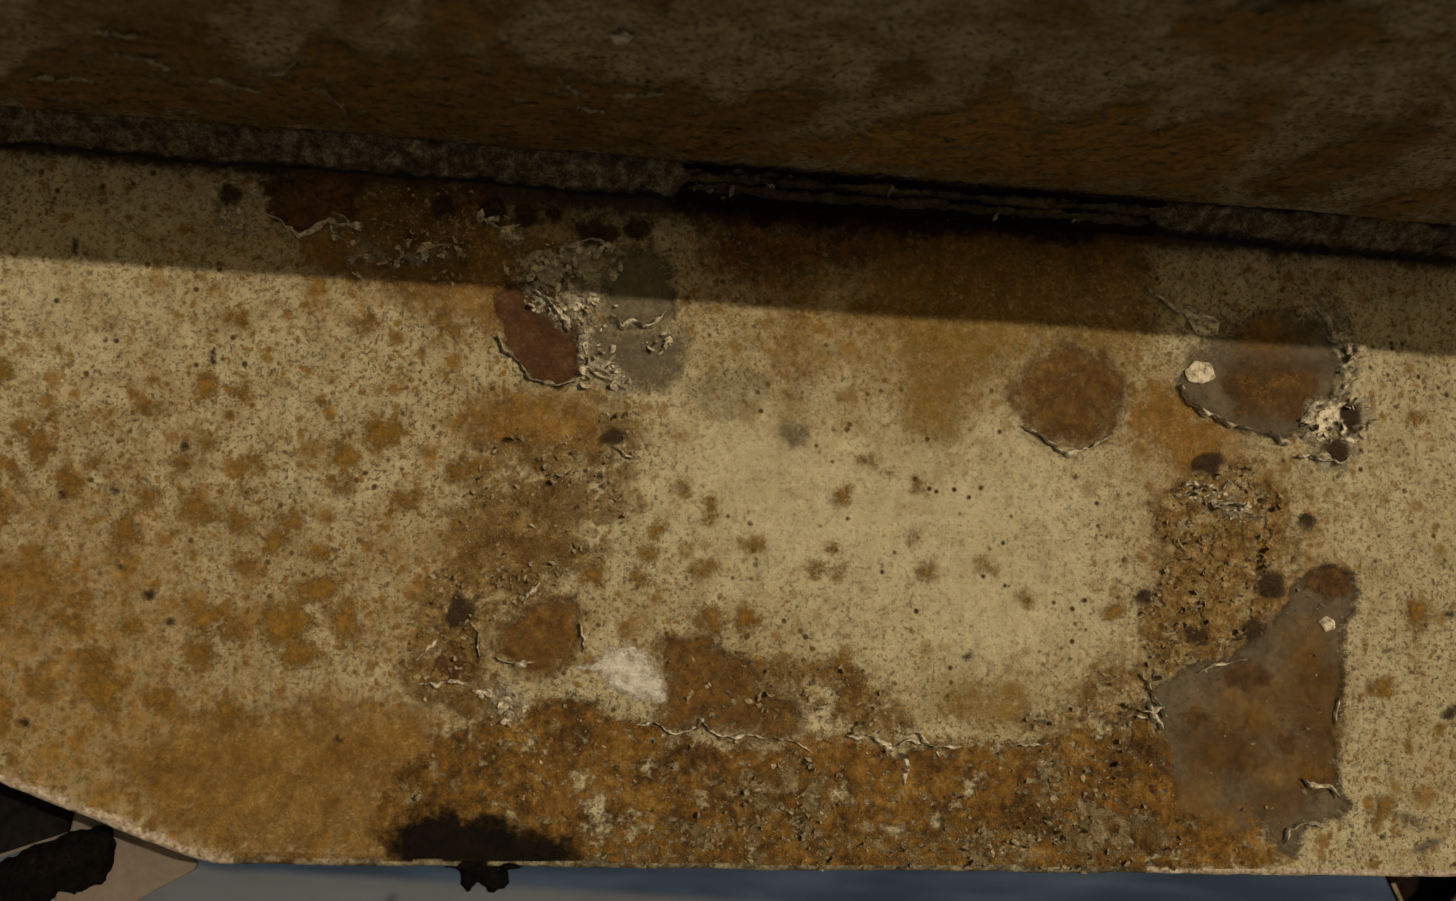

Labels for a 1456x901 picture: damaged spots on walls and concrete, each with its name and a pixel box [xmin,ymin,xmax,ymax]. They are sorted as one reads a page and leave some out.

rust [0,409,58,527]
rust [193,364,255,402]
rust [174,490,305,557]
rust [328,417,404,497]
peeling [218,169,692,726]
peeling [1008,340,1129,458]
peeling [1145,287,1380,465]
rust [52,584,125,722]
rust [185,546,361,674]
rust [692,604,763,636]
peeling [887,452,1363,874]
rust [364,692,1281,874]